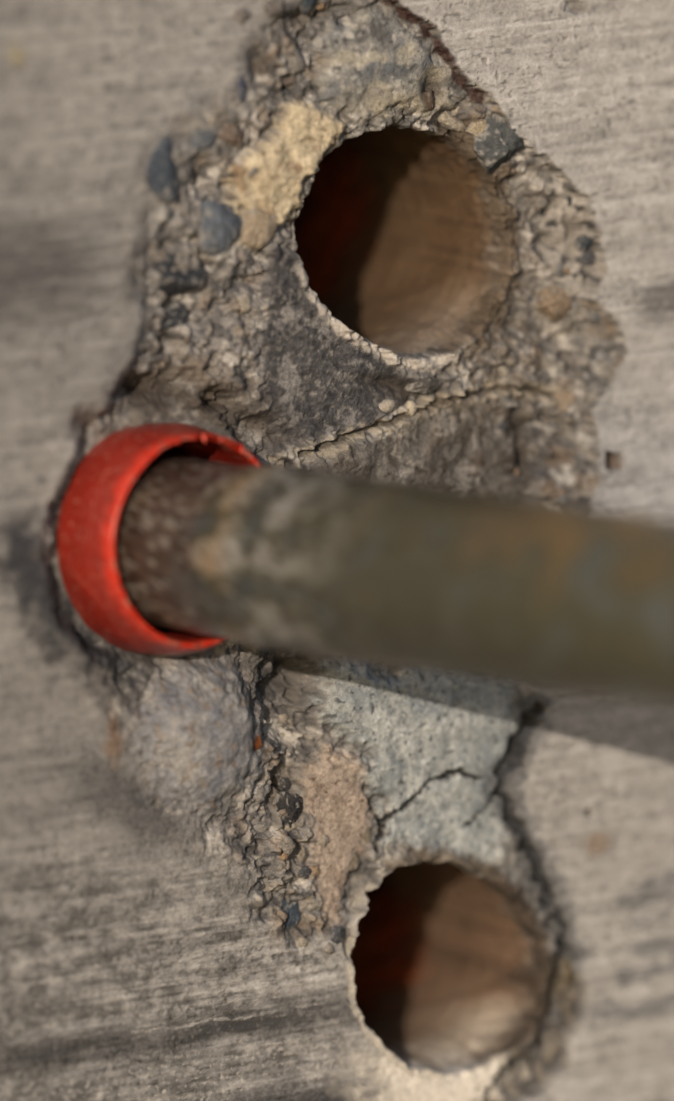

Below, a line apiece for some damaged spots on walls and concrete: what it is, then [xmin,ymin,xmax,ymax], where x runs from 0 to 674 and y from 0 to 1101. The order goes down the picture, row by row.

spalling [31,0,627,672]
crack [297,384,557,458]
spalling [58,630,593,1101]
crack [367,701,579,962]